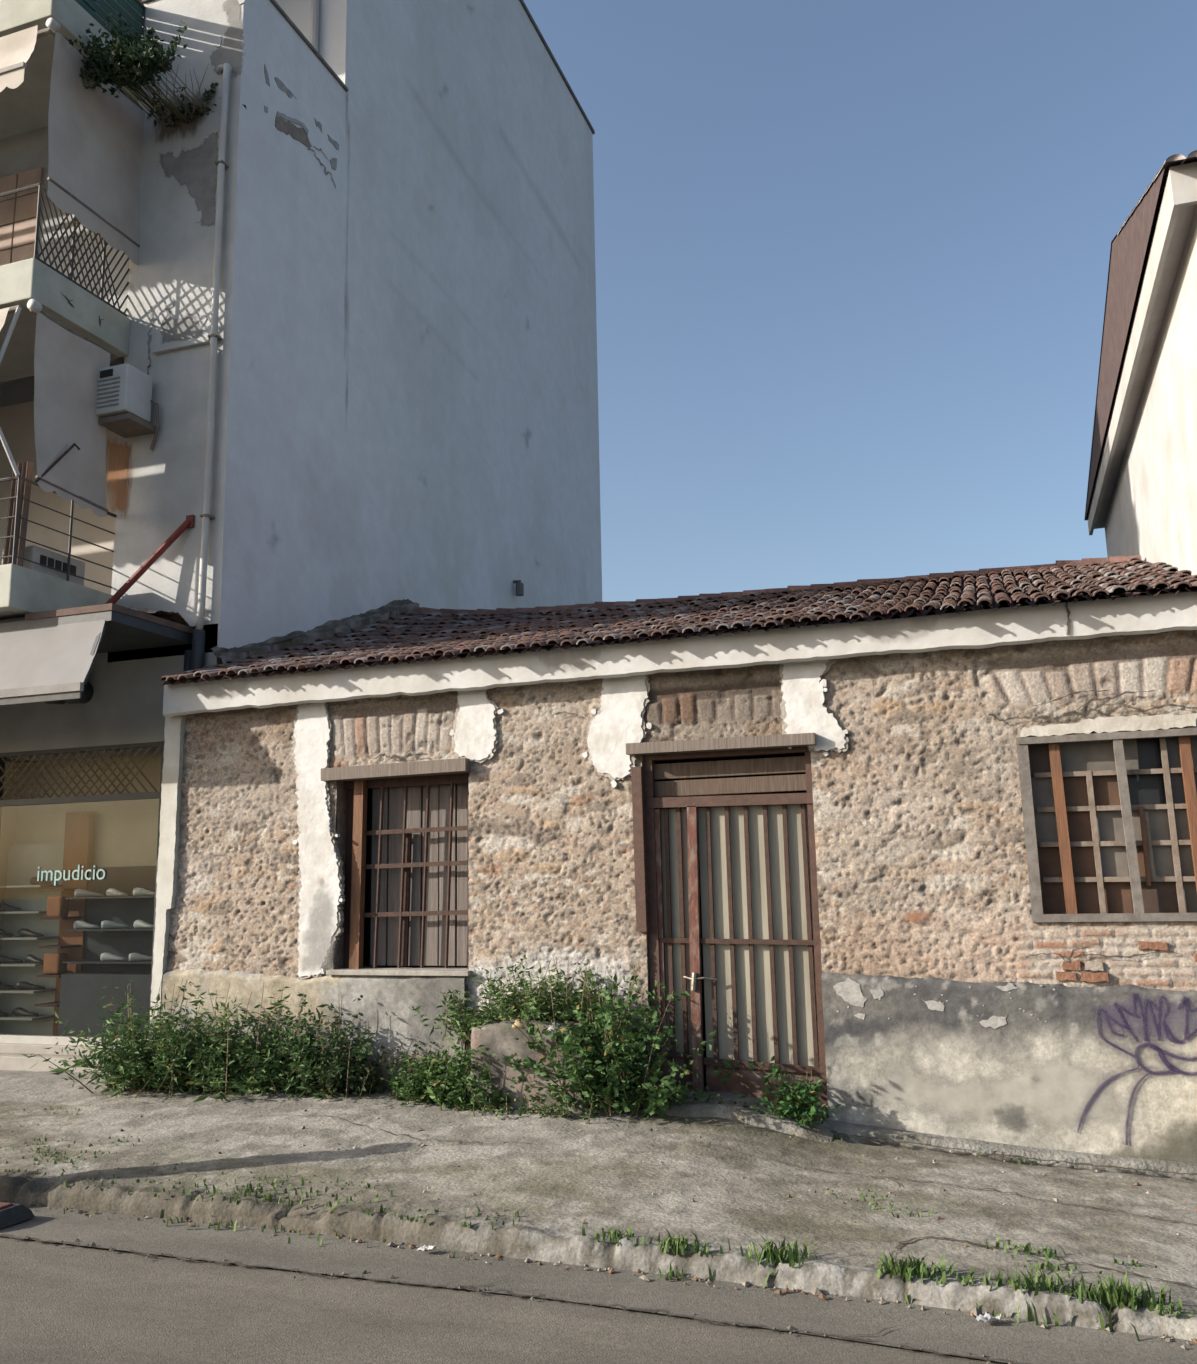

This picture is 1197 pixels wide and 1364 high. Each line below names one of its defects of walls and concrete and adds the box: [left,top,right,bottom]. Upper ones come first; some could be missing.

flaking render [210,0,245,76]
flaking render [160,122,220,226]
spalling [264,106,339,170]
crack [1064,602,1072,635]
flaking render [449,689,505,763]
flaking render [582,674,652,788]
flaking render [779,660,849,756]
flaking render [291,702,346,980]
peeling [833,977,884,1020]
peeling [914,986,948,1011]
peeling [977,983,1047,1029]
damp [1114,1125,1197,1164]